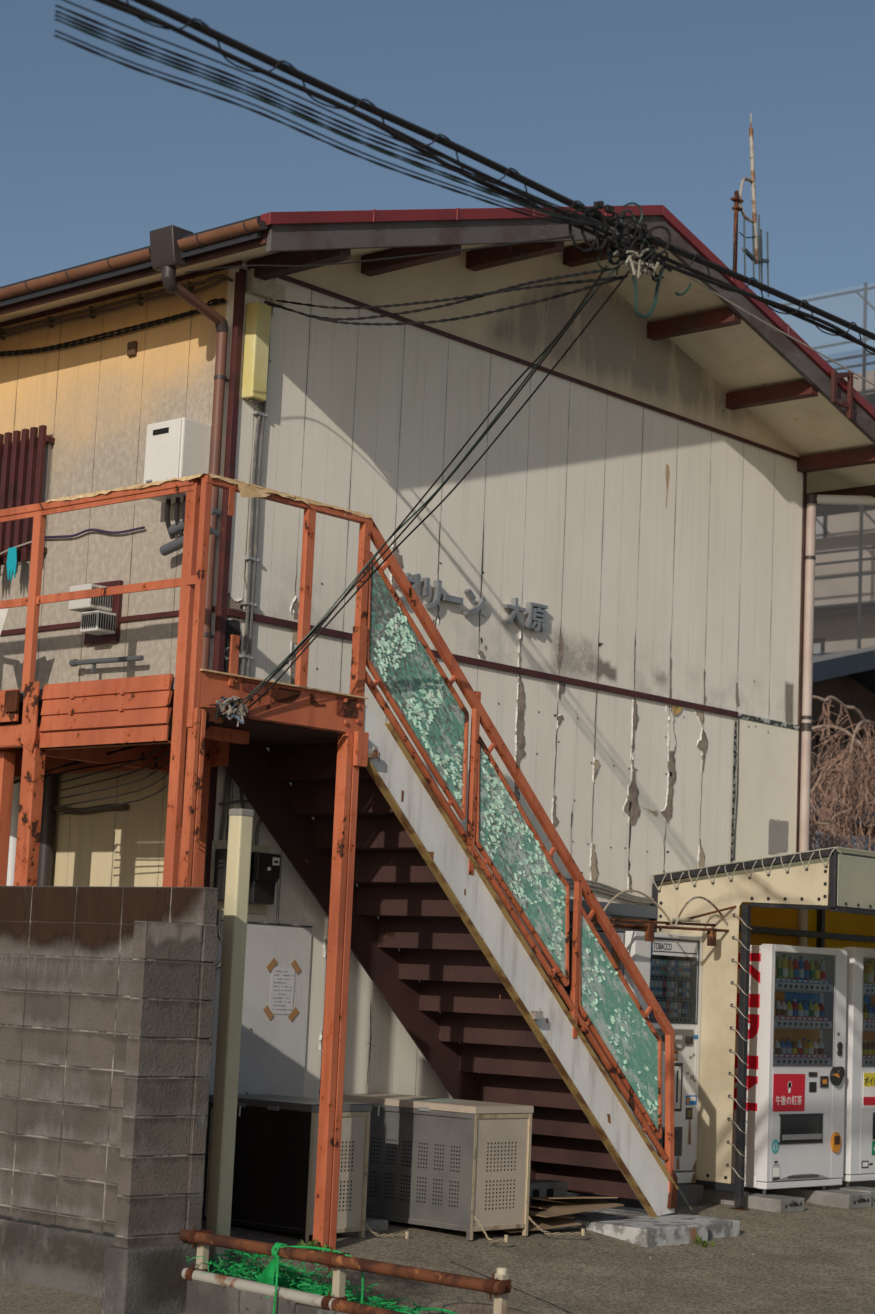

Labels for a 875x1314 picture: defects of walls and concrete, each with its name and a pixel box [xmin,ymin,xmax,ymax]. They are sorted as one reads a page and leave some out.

damp [497,290,726,411]
corrosion [202,707,222,723]
corrosion [243,680,358,718]
peeling [373,536,464,799]
peeling [480,628,567,960]
damp [556,640,615,680]
spalling [622,697,641,826]
spalling [659,656,708,826]
crack [451,1261,574,1314]